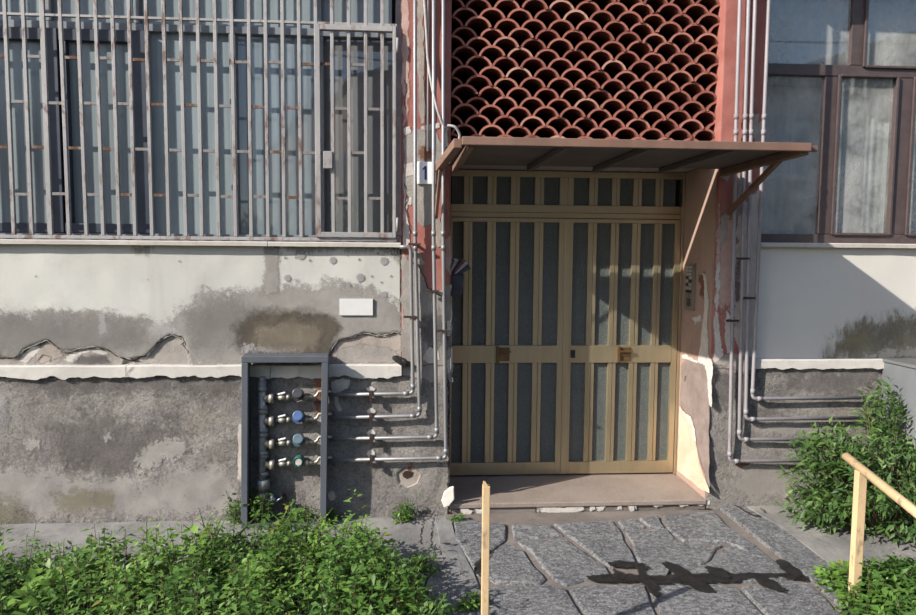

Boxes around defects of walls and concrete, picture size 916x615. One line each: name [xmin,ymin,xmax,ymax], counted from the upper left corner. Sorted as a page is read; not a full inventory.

peeling [753,114,762,142]
peeling [329,0,453,488]
peeling [0,334,190,365]
water stain [17,376,235,399]
water stain [0,247,402,365]
peeling [677,169,759,507]
water stain [746,402,829,438]
water stain [786,313,916,396]
water stain [0,404,241,523]
water stain [725,458,797,503]